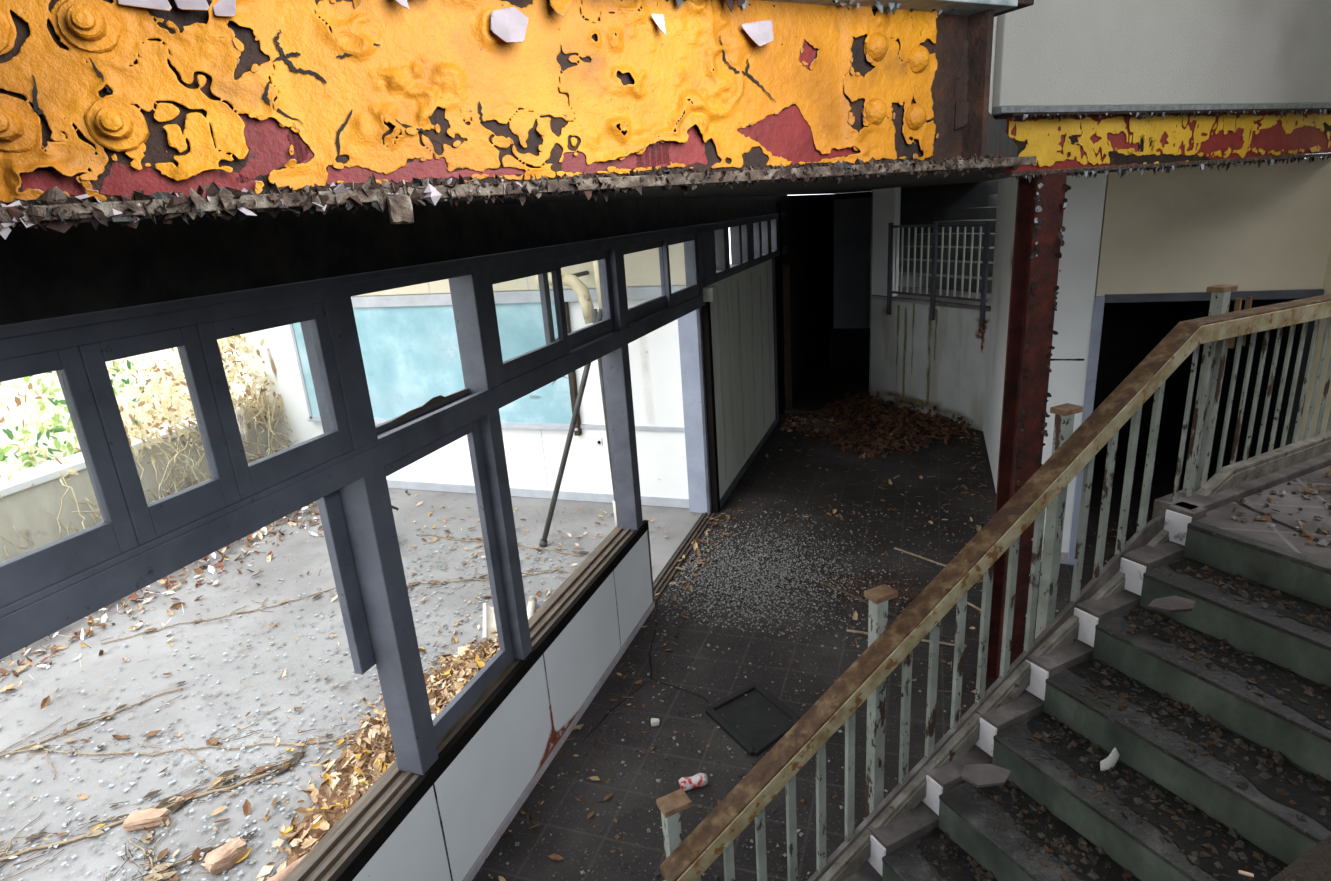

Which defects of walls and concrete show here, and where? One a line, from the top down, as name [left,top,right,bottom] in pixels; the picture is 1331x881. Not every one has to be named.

peeling [118,0,270,80]
peeling [491,0,533,43]
peeling [651,14,666,35]
peeling [741,20,774,47]
peeling [799,40,817,70]
peeling [849,35,875,77]
peeling [891,11,969,160]
peeling [326,110,546,184]
peeling [561,127,708,174]
peeling [737,99,866,165]
peeling [1012,139,1029,155]
peeling [1107,120,1331,166]